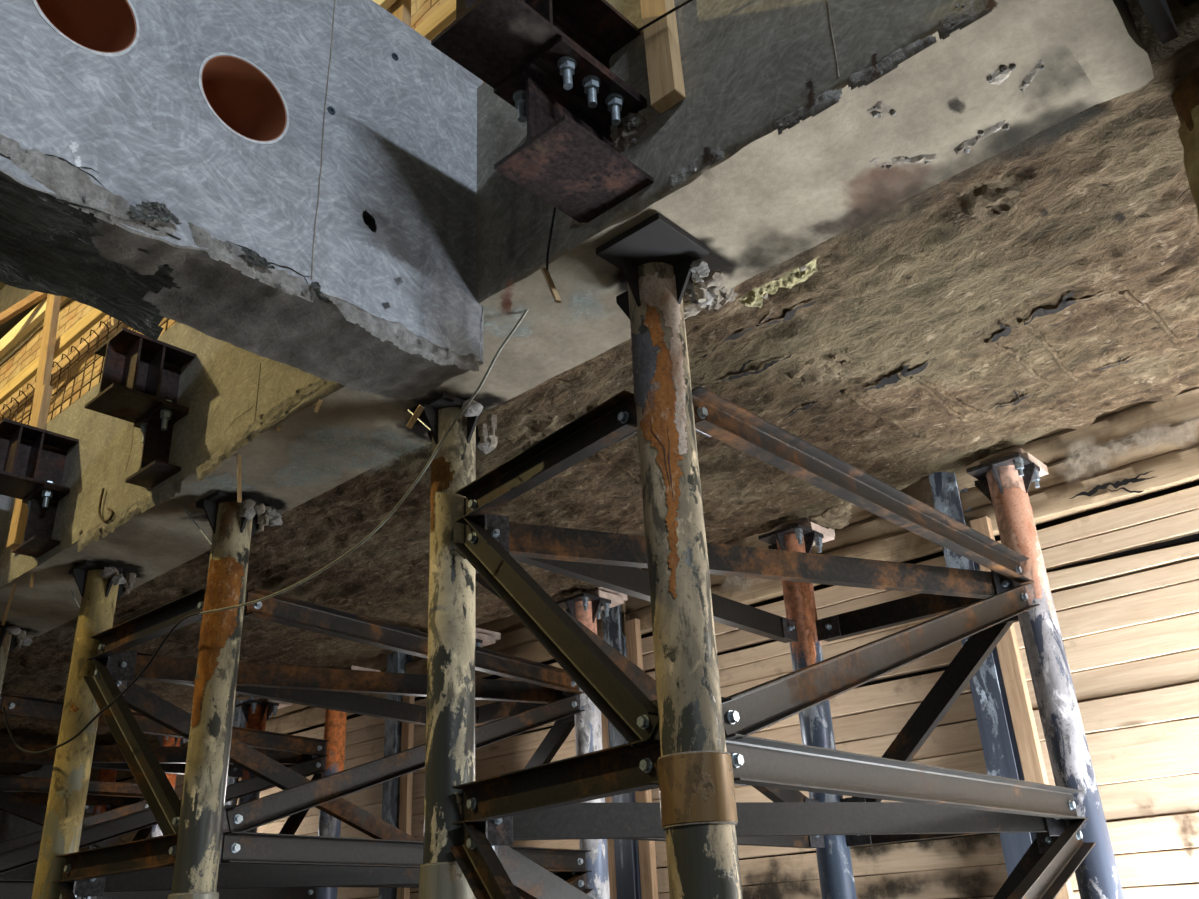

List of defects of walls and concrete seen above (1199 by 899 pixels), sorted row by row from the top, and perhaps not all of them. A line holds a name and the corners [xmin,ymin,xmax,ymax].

spalling [774,0,998,135]
spalling [986,59,1045,94]
leakage [69,141,82,168]
spalling [954,119,1010,154]
spalling [0,134,479,372]
spalling [686,239,739,306]
spalling [503,404,598,450]
rust [640,305,686,598]
rust [430,456,455,533]
rust [998,487,1042,599]
rust [191,557,244,728]
rust [797,582,816,665]